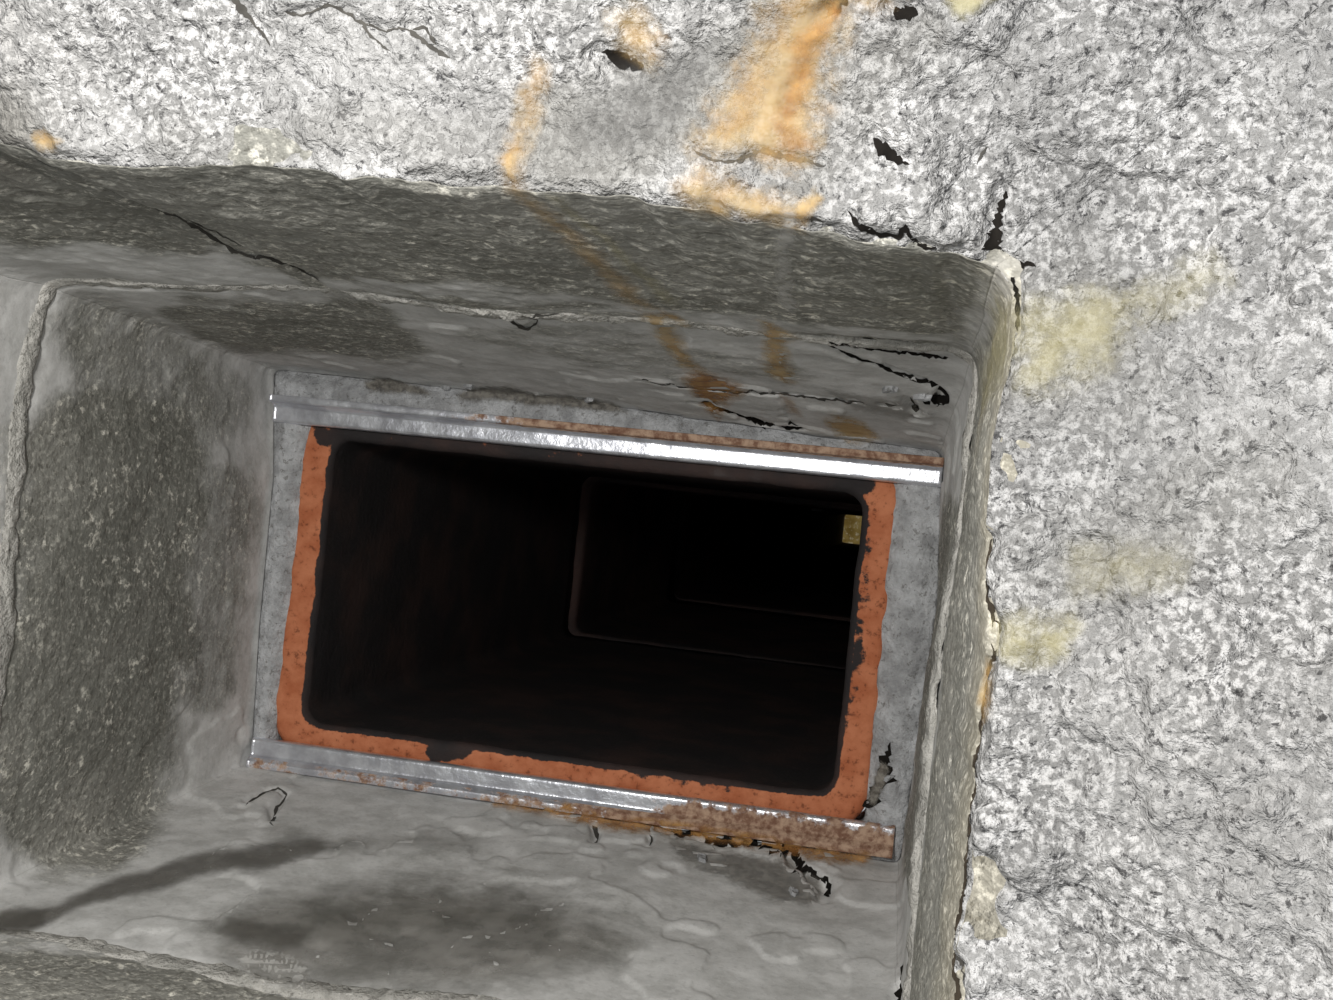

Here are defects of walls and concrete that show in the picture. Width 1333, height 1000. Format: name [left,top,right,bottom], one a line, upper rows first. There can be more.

crack [232,0,450,58]
crack [112,191,318,280]
rust [648,315,739,414]
crack [642,342,949,430]
rust [828,419,877,438]
crack [952,539,1001,1000]
rust [497,803,867,863]
leakage [0,842,323,929]
crack [894,965,903,1000]